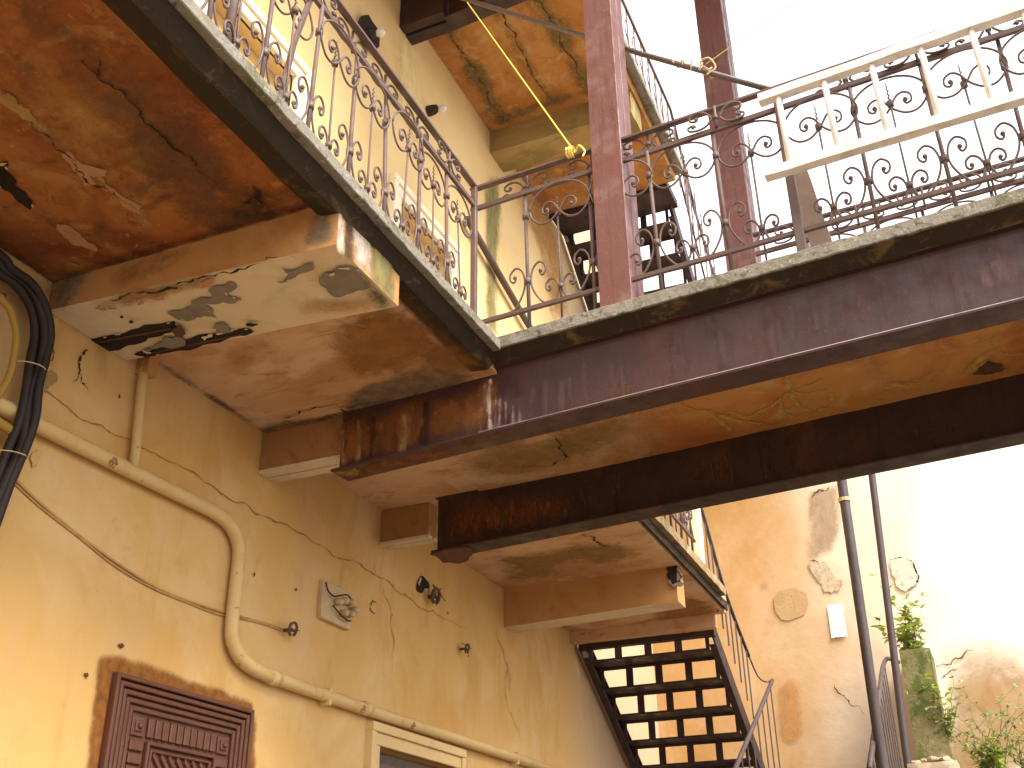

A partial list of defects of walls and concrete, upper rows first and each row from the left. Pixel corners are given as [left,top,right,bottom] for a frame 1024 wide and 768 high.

peeling [0,92,150,226]
crack [81,57,267,205]
peeling [57,224,97,251]
spalling [91,278,258,357]
peeling [278,263,370,299]
water stain [264,303,477,433]
spalling [973,361,1007,375]
rust [334,383,500,477]
crack [46,349,520,734]